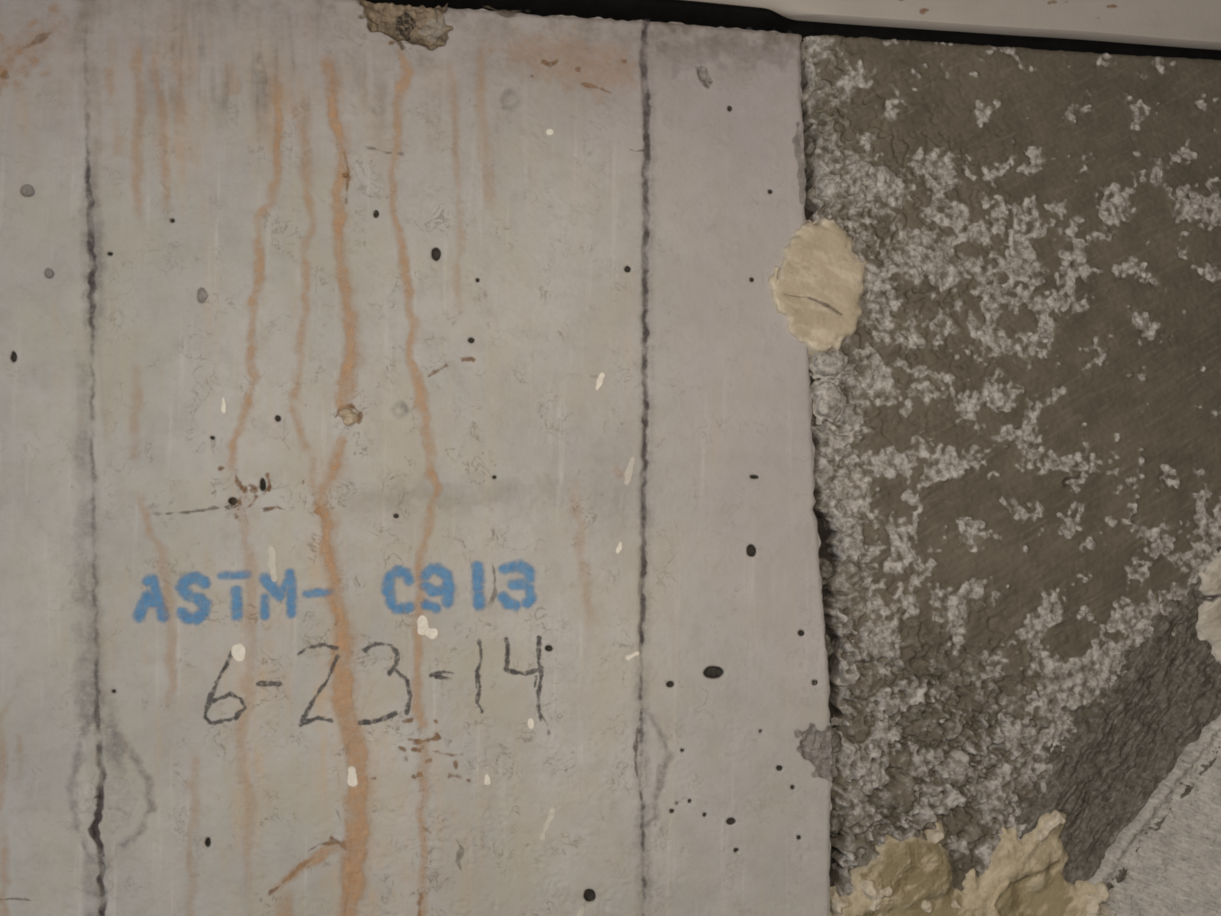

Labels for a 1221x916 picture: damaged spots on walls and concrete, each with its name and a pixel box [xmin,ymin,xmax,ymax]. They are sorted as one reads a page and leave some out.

spalling [360,0,453,50]
crack [85,167,93,206]
crack [641,21,650,240]
crack [88,236,96,327]
crack [641,270,649,369]
rust [235,473,271,507]
crack [640,399,649,643]
crack [78,709,152,916]
rust [270,508,375,916]
rust [399,635,441,778]
crack [633,697,656,846]